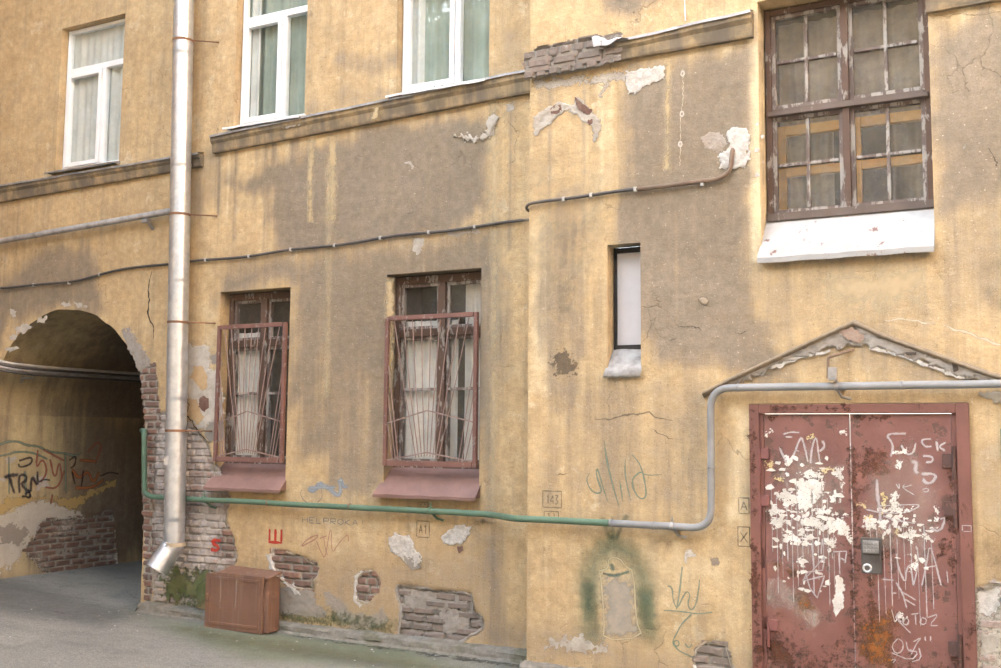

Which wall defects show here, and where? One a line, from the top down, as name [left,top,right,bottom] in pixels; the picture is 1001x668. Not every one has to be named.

flaking render [522,32,665,142]
flaking render [700,122,764,177]
rust [767,403,890,421]
flaking render [122,327,238,608]
flaking render [0,494,118,574]
flaking render [265,548,326,619]
flaking render [353,570,381,608]
flaking render [395,584,484,642]
flaking render [692,638,733,668]
rust [749,539,764,667]
rust [775,447,899,668]
flaking render [973,579,1001,668]